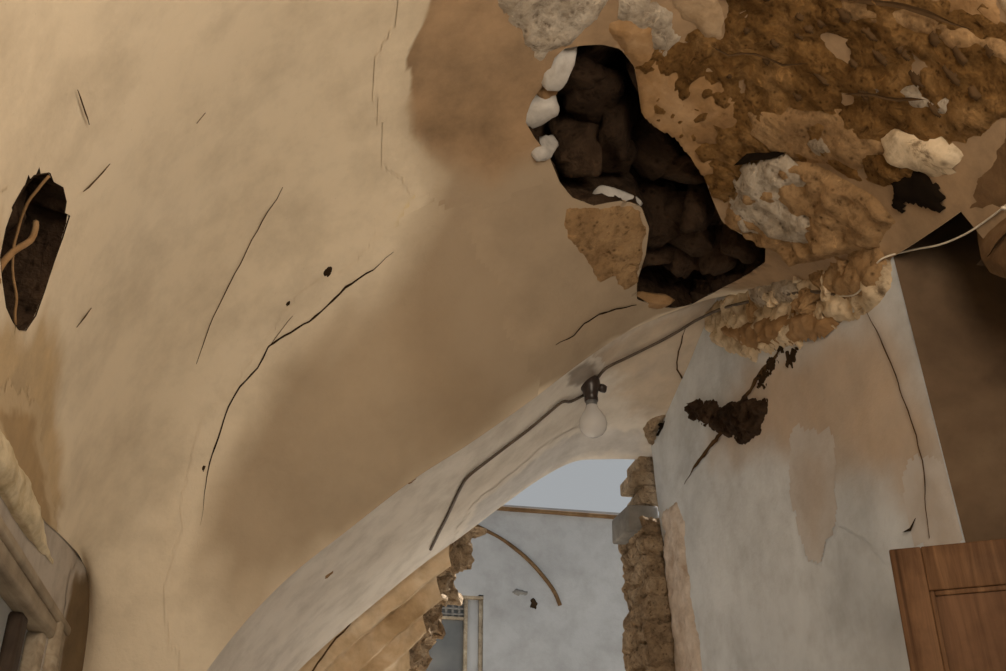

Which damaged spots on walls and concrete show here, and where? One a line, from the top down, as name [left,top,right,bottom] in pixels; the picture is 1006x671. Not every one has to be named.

crack [196,187,283,364]
crack [200,253,392,524]
peeling [620,415,702,671]
spalling [373,0,1006,363]
spalling [684,394,768,445]
crack [987,233,1006,257]